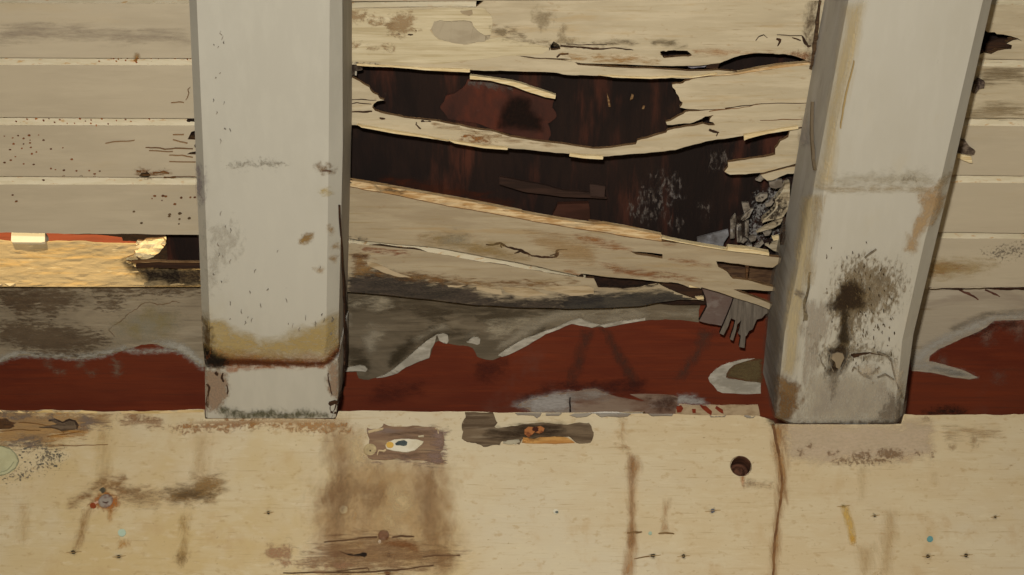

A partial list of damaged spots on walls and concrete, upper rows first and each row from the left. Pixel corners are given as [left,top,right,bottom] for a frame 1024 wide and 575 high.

leakage [809,102,817,170]
crack [486,242,568,258]
peeling [730,174,785,251]
leakage [201,318,337,355]
peeling [0,286,700,434]
leakage [773,198,905,420]
peeling [910,287,1024,379]
spalling [462,358,762,447]
peeling [367,424,447,464]
leakage [266,437,460,575]
leakage [626,494,635,574]